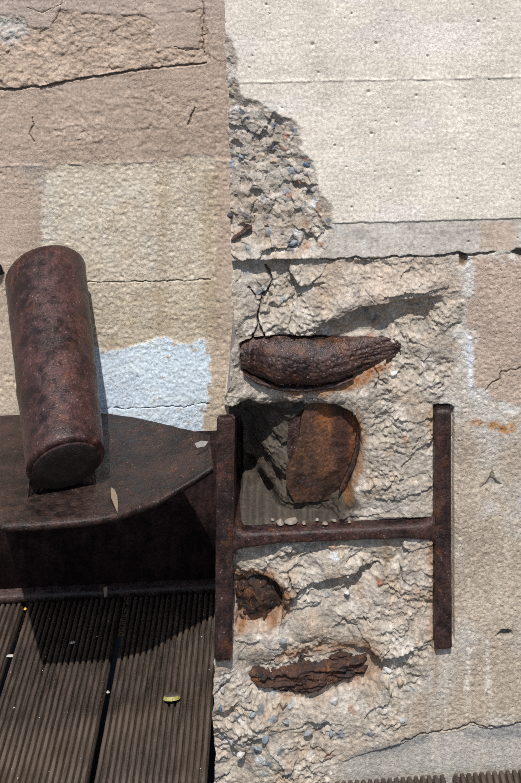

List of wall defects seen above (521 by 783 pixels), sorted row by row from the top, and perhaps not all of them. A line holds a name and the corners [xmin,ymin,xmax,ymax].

crack [0,0,208,92]
spalling [224,36,336,261]
flaking render [40,154,218,350]
crack [248,264,274,336]
corrosion [281,359,393,400]
spalling [224,297,466,519]
crack [485,367,521,392]
corrosion [233,567,299,640]
spalling [212,538,433,783]
corrosion [267,636,386,708]
corrosion [425,541,441,699]
crack [401,721,521,743]